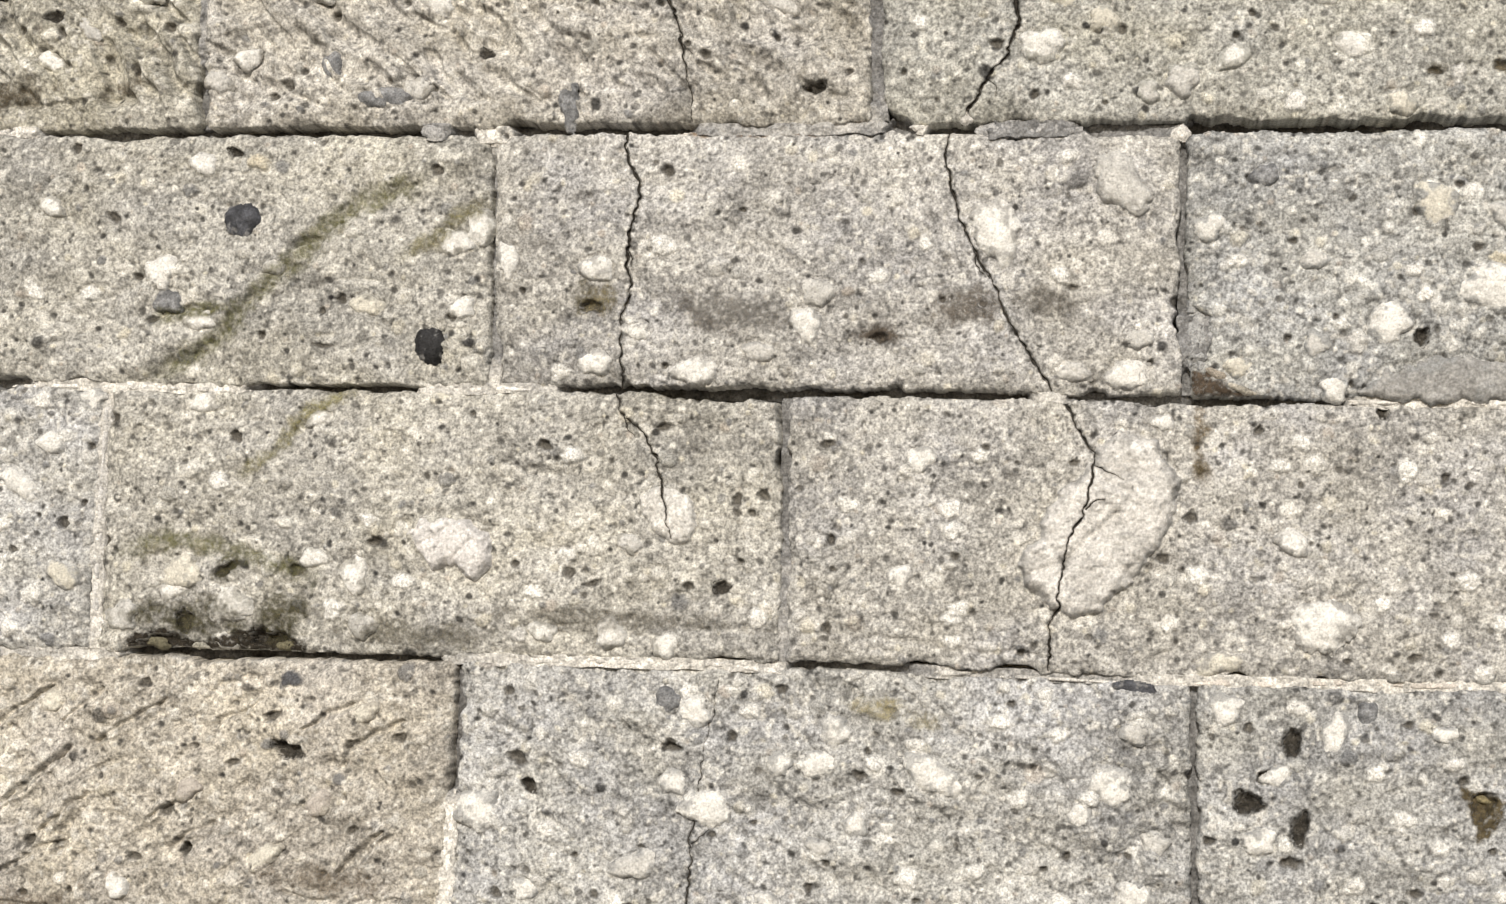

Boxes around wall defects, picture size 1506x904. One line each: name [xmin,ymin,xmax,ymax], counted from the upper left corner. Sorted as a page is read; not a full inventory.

crack [667,0,693,122]
crack [616,133,671,538]
crack [944,0,1122,671]
crack [685,680,719,904]